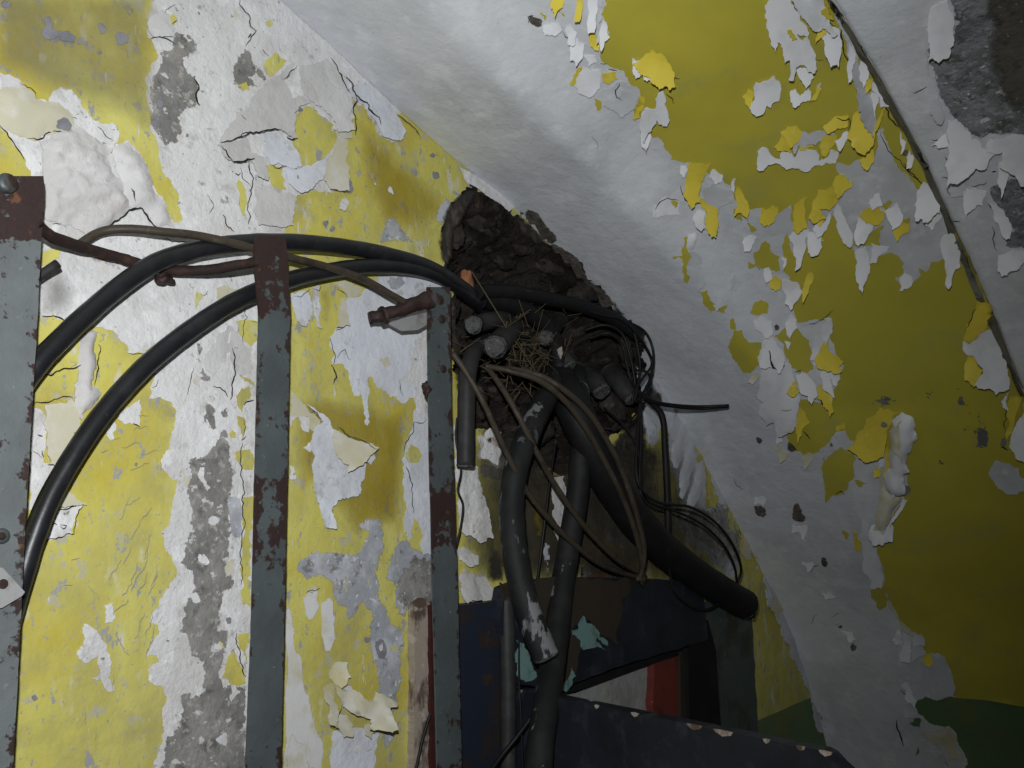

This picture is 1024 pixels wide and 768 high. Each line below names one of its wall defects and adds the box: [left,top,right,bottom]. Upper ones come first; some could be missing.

peeling [45,489,87,542]
peeling [0,73,146,179]
peeling [27,252,255,513]
peeling [77,301,258,768]
peeling [36,0,421,347]
peeling [283,274,495,768]
spalling [436,167,622,316]
peeling [528,0,678,151]
spalling [452,303,824,733]
peeling [652,0,1024,768]